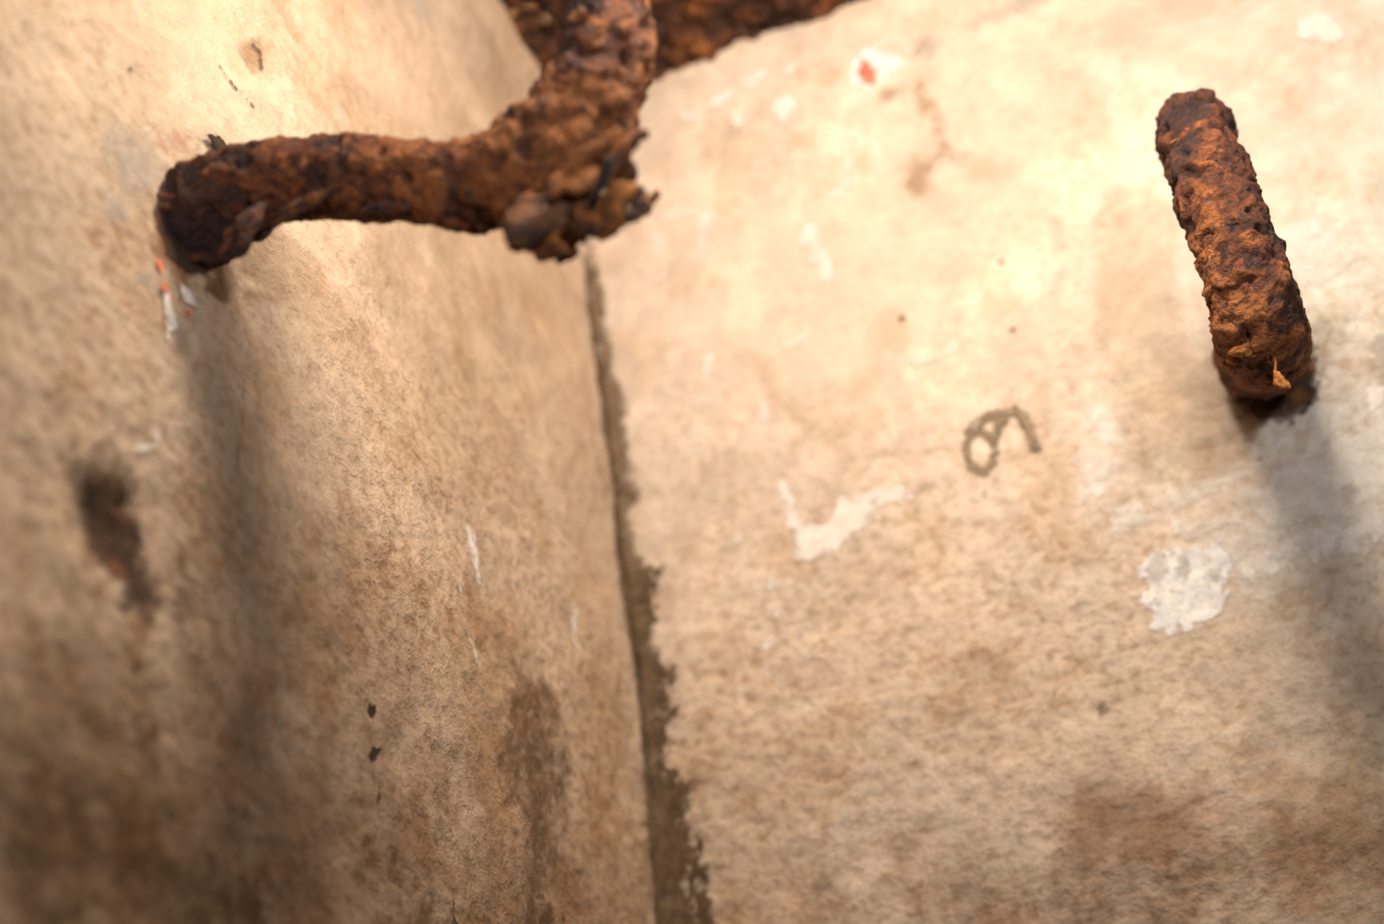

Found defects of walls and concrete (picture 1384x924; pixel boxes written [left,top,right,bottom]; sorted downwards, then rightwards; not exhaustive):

corrosion [153,181,347,277]
corrosion [502,127,661,265]
corrosion [1199,245,1221,265]
corrosion [1227,340,1263,358]
corrosion [1235,347,1320,424]
corrosion [74,458,159,624]
peeling [1137,506,1384,636]